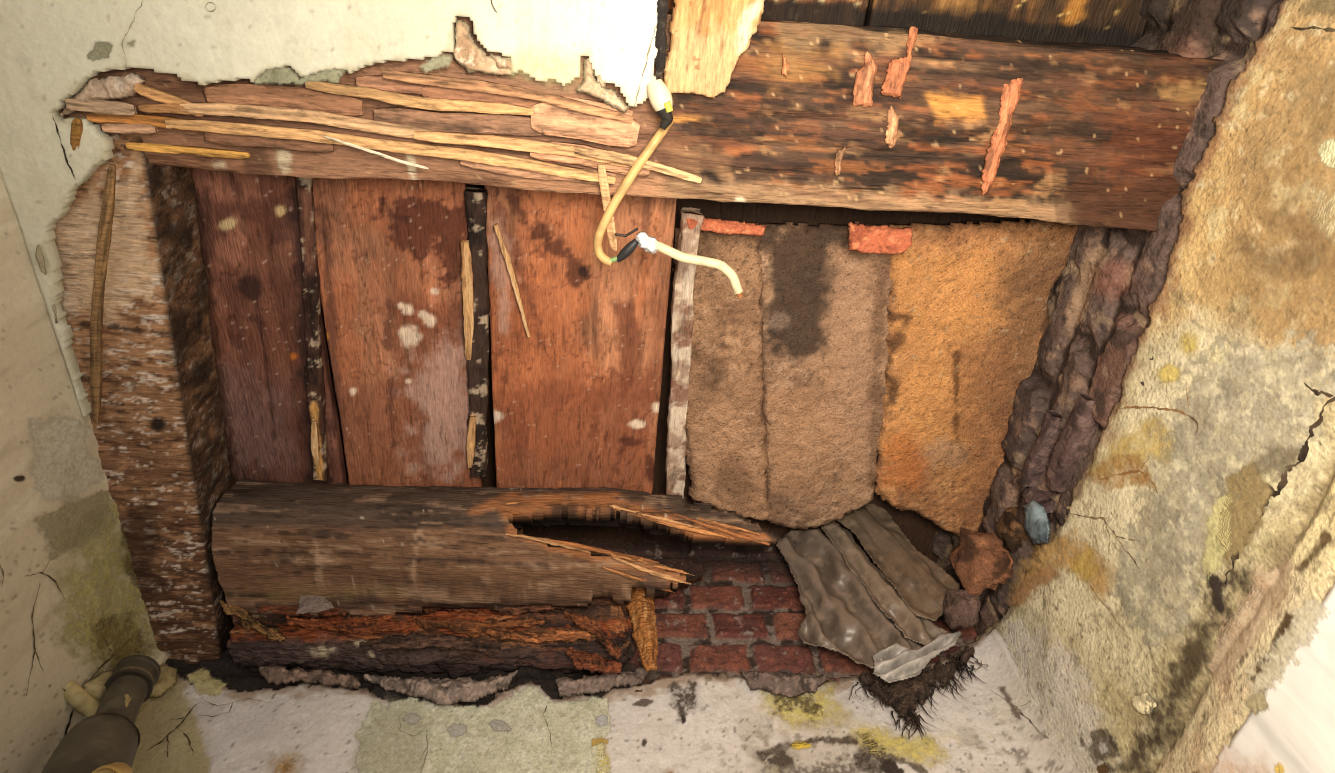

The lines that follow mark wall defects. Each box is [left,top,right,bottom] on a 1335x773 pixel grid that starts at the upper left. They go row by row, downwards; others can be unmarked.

peeling [87,42,112,61]
spalling [60,72,147,116]
peeling [255,67,345,84]
spalling [420,20,515,76]
spalling [577,58,629,113]
crack [1225,383,1335,583]
peeling [36,490,113,559]
damp [62,503,154,674]
flaking render [165,537,874,773]